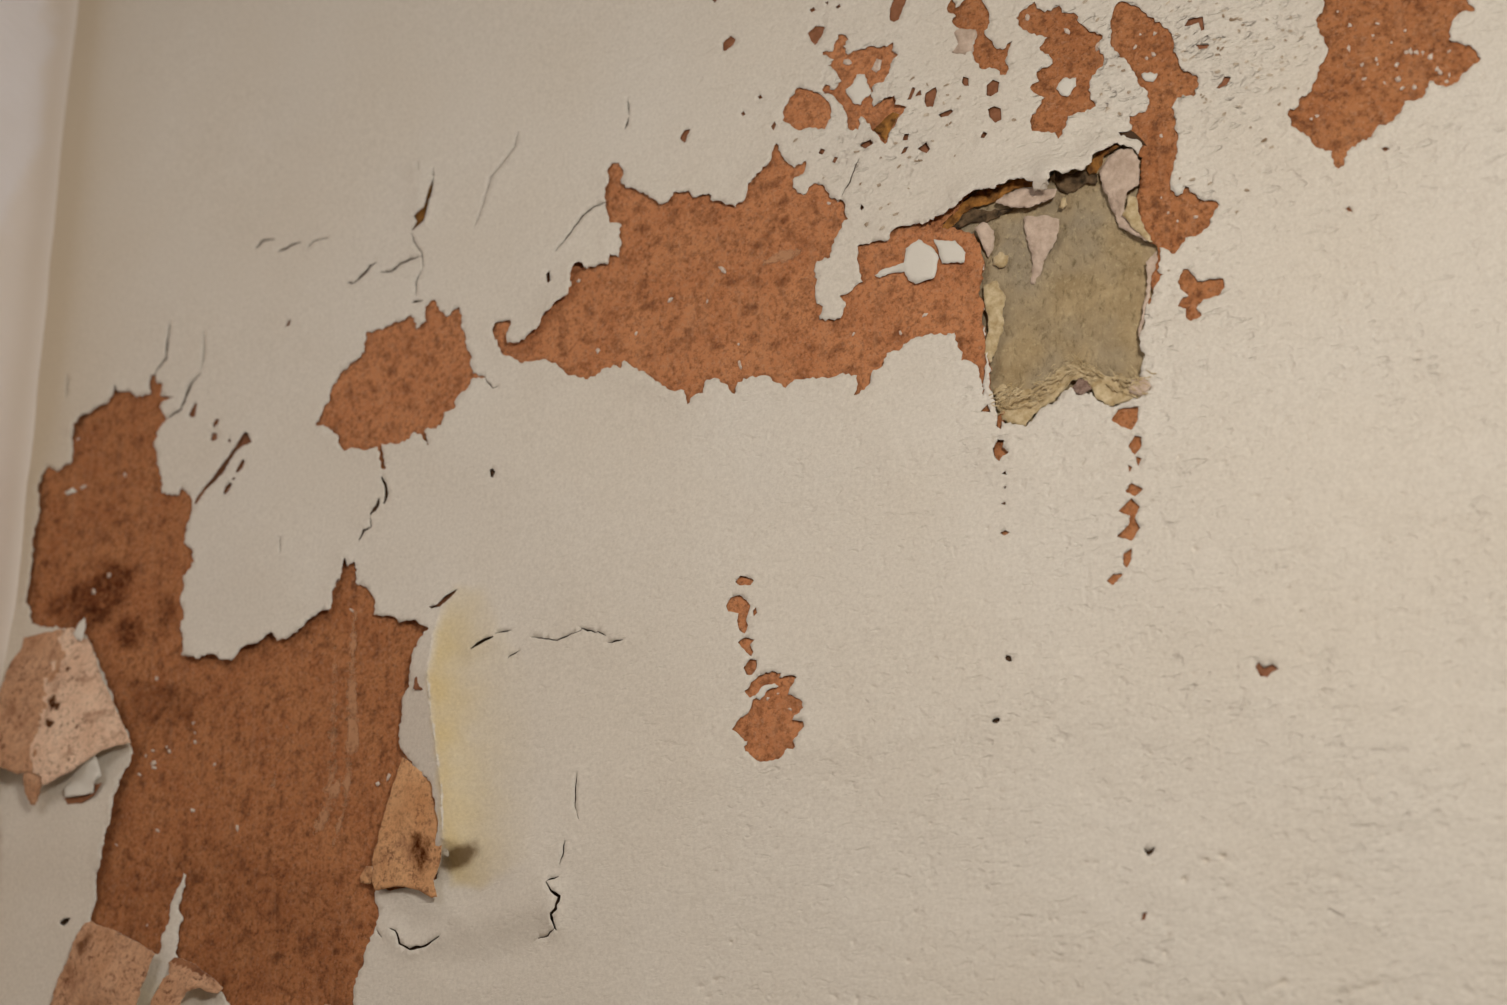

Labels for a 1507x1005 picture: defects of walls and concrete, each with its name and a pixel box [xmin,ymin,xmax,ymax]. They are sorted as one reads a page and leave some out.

crack [256,238,327,252]
crack [347,175,434,303]
crack [475,133,519,226]
peeling [492,0,1481,505]
peeling [316,300,499,469]
peeling [0,322,442,1005]
crack [471,628,623,658]
peeling [726,576,804,762]
crack [538,777,578,939]